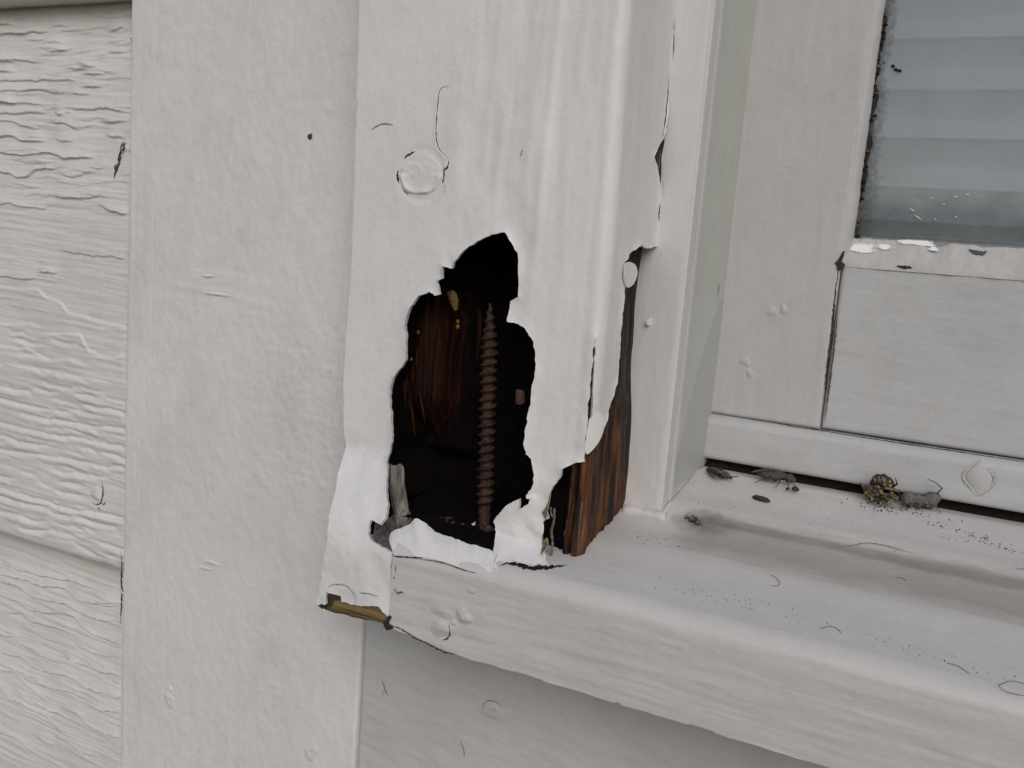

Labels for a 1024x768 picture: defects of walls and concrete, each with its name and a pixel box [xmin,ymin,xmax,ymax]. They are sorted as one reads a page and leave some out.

peeling [655,84,669,183]
peeling [499,247,651,570]
peeling [374,516,396,542]
spalling [317,593,393,630]